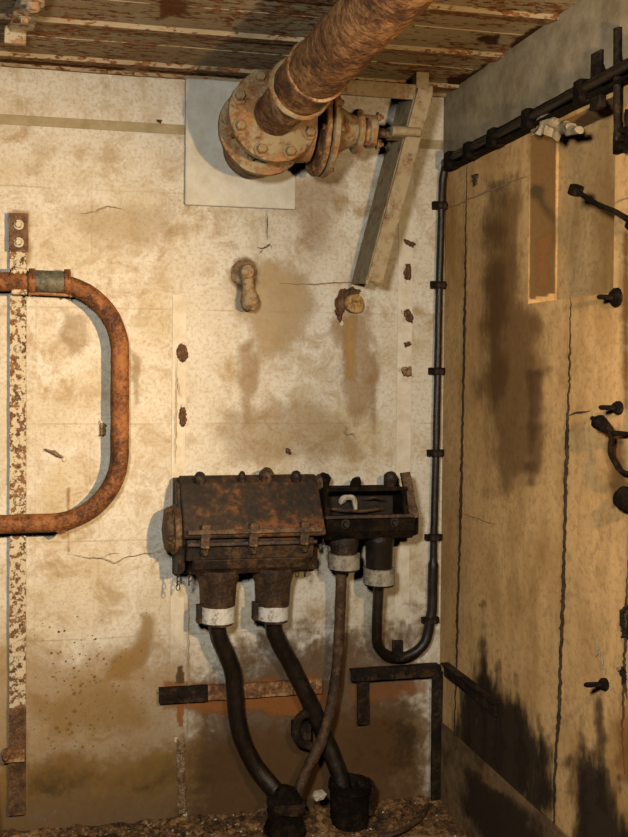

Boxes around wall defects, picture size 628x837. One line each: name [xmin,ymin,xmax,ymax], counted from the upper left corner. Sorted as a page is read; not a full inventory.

corrosion [478,35,500,44]
corrosion [511,26,543,48]
corrosion [447,64,487,85]
crack [76,551,158,563]
spalling [619,604,628,640]
corrosion [165,666,186,687]
damp [0,612,243,831]
corrosion [168,700,227,726]
corrosion [244,695,303,716]
damp [377,703,431,800]
damp [455,641,554,837]
damp [566,699,628,837]